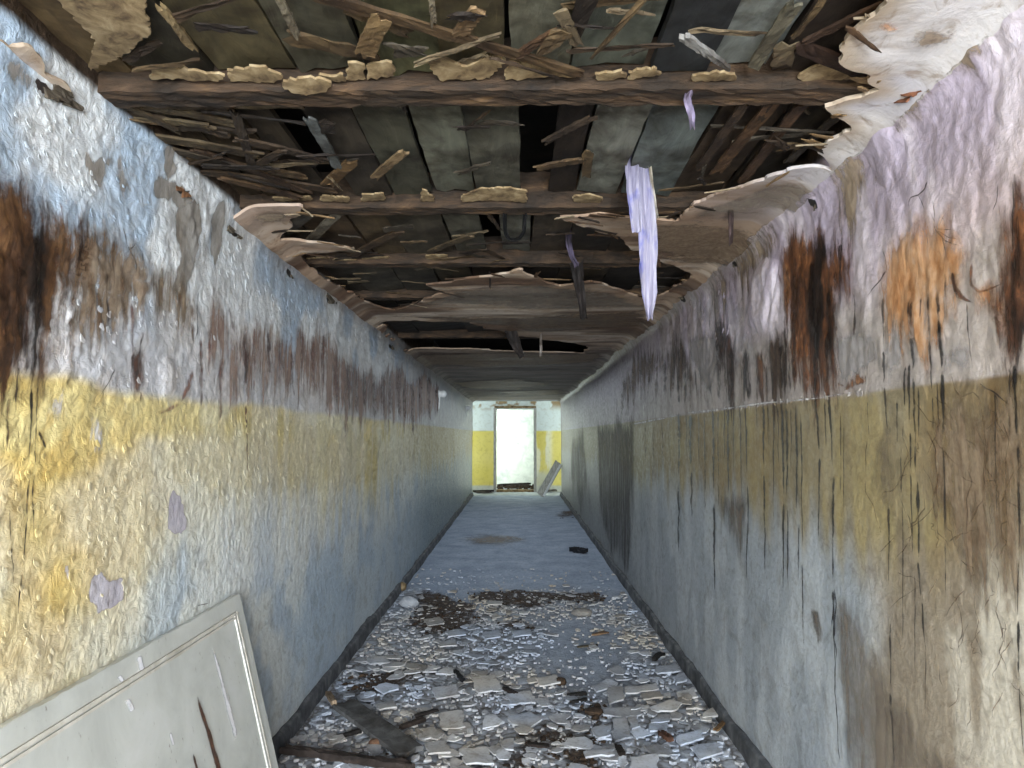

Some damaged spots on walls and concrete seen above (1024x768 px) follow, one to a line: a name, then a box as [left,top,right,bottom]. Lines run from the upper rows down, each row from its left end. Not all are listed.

rust [0,173,89,462]
peeling [19,441,143,631]
peeling [62,146,130,222]
peeling [132,145,356,335]
rust [161,301,439,436]
leakage [598,419,653,570]
rust [677,228,866,618]
leakage [812,612,820,641]
flaking render [894,90,922,103]
crack [865,385,1017,670]
rust [882,183,1024,753]
leakage [931,393,1024,602]